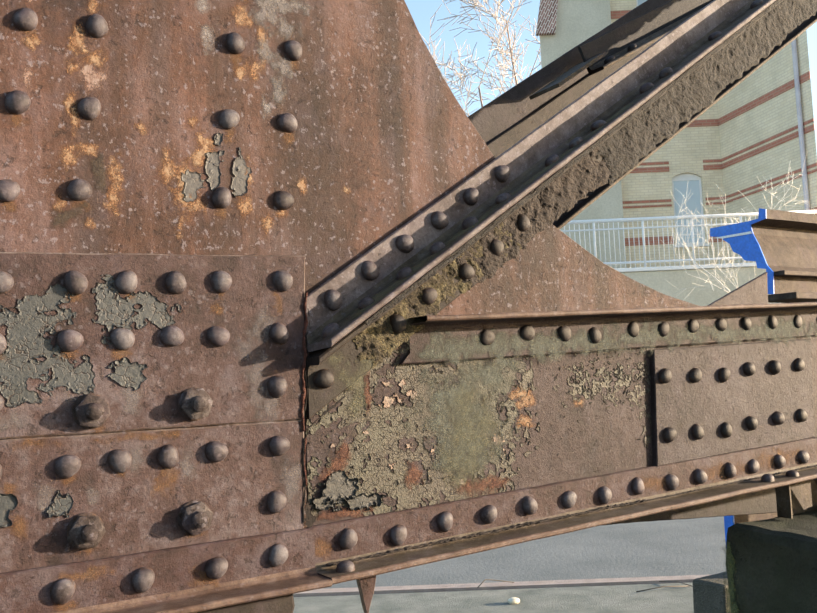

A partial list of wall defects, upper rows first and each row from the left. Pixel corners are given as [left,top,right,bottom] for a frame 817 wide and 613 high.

rust [67,24,108,72]
rust [63,93,79,135]
rust [62,143,98,169]
rust [104,156,124,215]
rust [159,117,226,239]
peeling [181,133,252,202]
rust [238,196,253,216]
peeling [92,274,182,345]
peeling [0,284,95,407]
peeling [107,357,148,390]
peeling [305,317,817,521]
peeling [0,493,18,528]